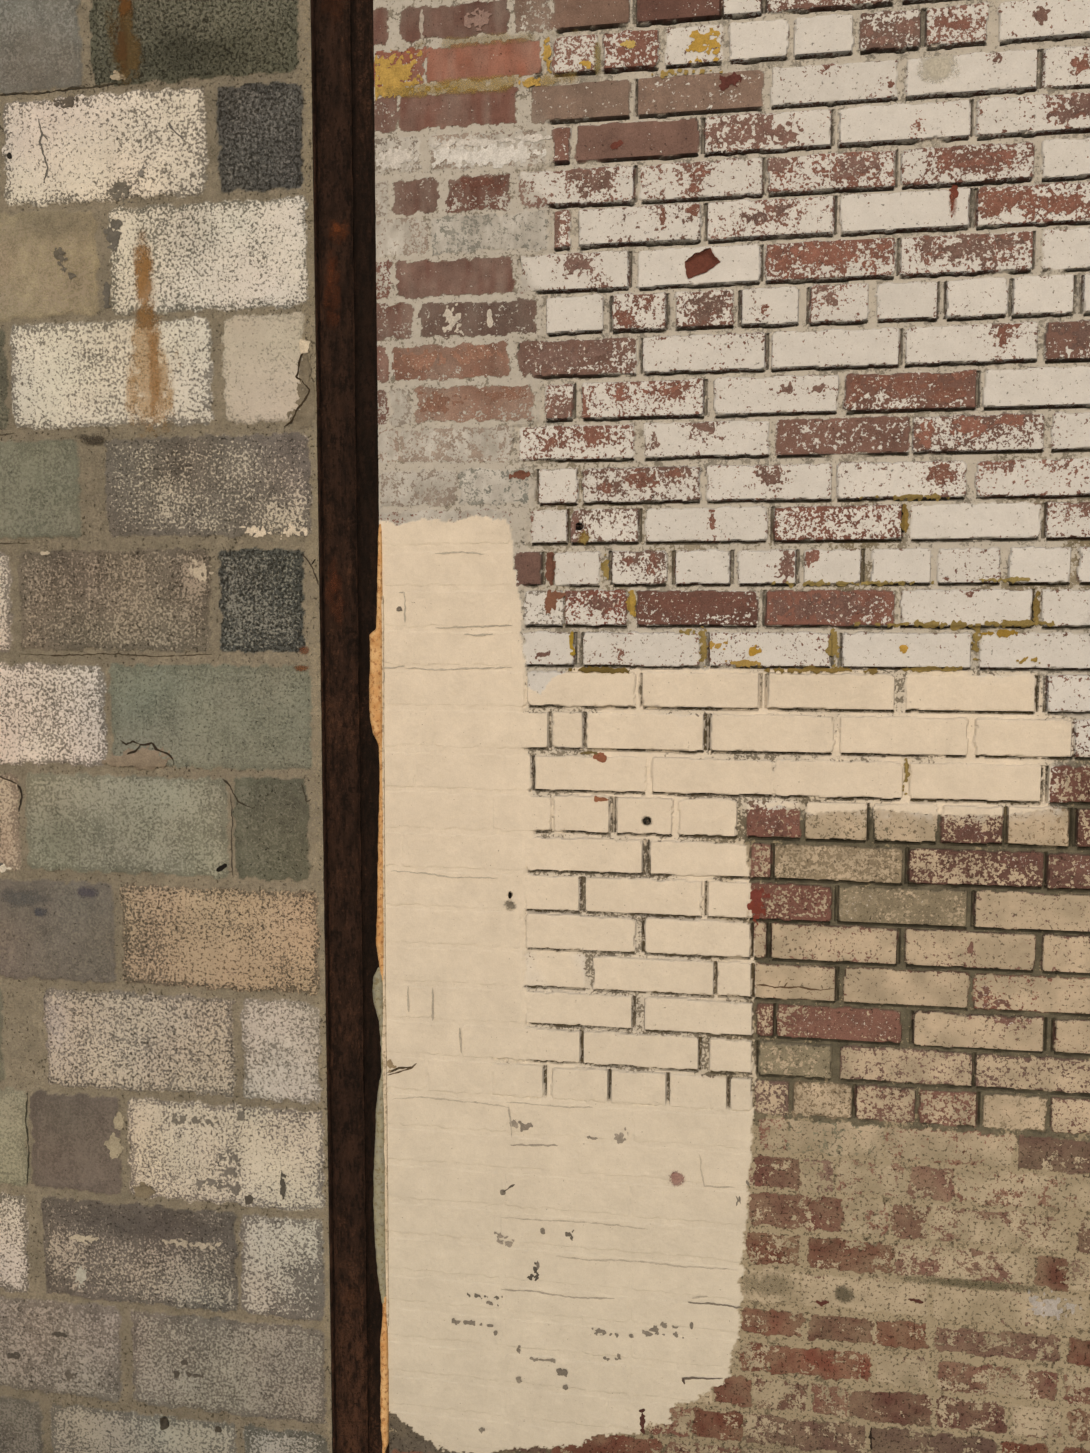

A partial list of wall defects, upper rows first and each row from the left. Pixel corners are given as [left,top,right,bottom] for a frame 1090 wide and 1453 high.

corrosion [107,0,141,84]
peeling [1032,6,1051,25]
peeling [705,113,815,173]
peeling [1046,93,1090,123]
corrosion [134,235,155,328]
peeling [554,216,604,285]
spalling [684,247,729,326]
peeling [766,240,892,306]
peeling [917,185,1090,270]
peeling [845,370,1033,501]
peeling [756,467,791,491]
peeling [544,550,1055,675]